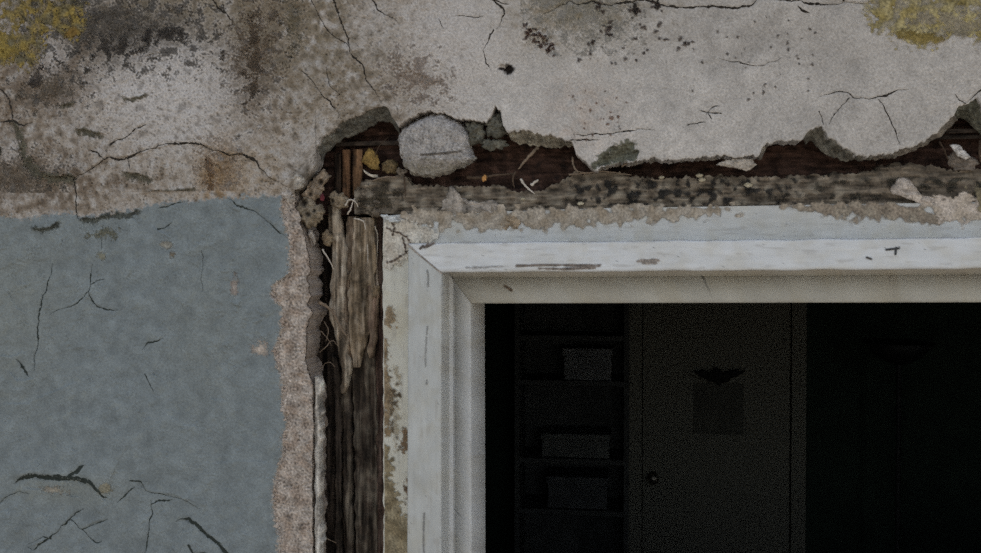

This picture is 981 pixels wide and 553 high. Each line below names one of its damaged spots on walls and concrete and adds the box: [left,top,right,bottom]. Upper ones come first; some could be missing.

crack [439,0,507,68]
crack [543,0,756,15]
crack [786,0,877,13]
crack [0,89,29,126]
flaking render [0,0,981,193]
crack [570,129,654,141]
crack [818,89,906,143]
crack [73,124,291,220]
peeling [779,186,981,225]
spalling [252,196,314,553]
peeling [384,306,408,553]
crack [0,465,228,553]